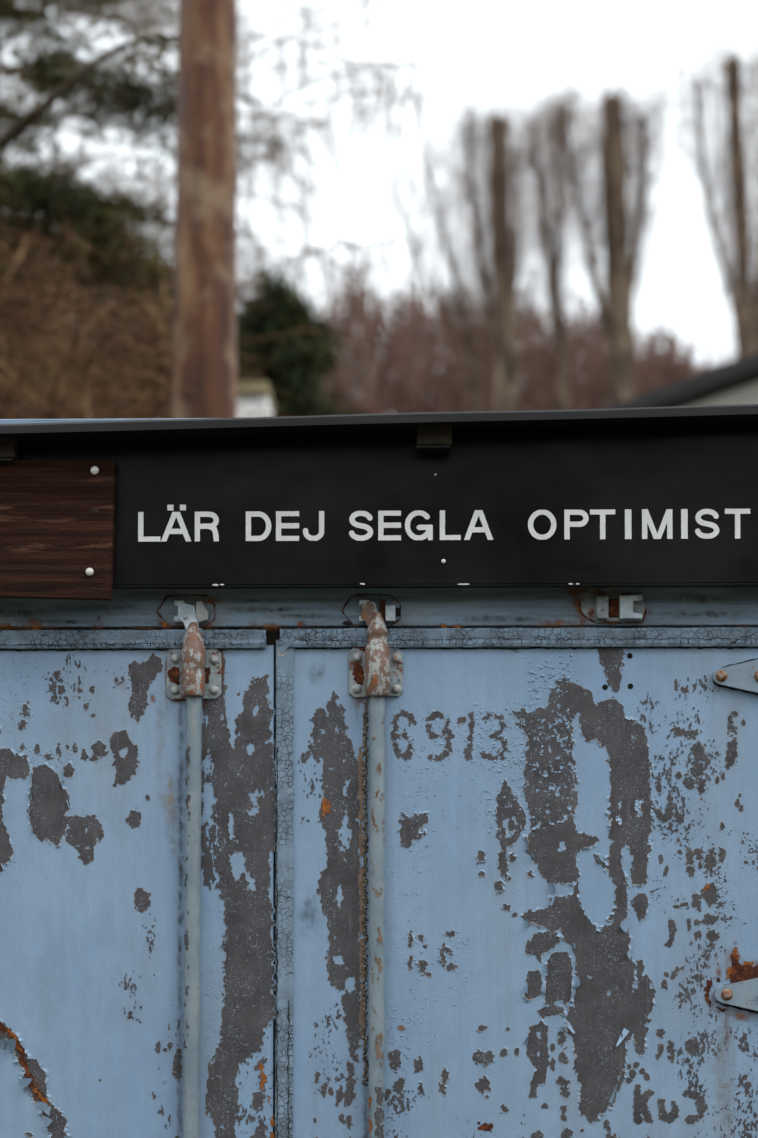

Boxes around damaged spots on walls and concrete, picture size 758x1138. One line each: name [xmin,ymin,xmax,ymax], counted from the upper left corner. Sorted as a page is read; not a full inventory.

corrosion [165,661,180,686]
corrosion [352,647,365,685]
peeling [185,648,276,1138]
peeling [294,690,451,1138]
peeling [451,646,758,1138]
corrosion [0,1023,52,1107]
peeling [0,1017,74,1138]
peeling [119,970,155,1023]
spalling [149,965,189,1138]
corrosion [704,947,758,1019]